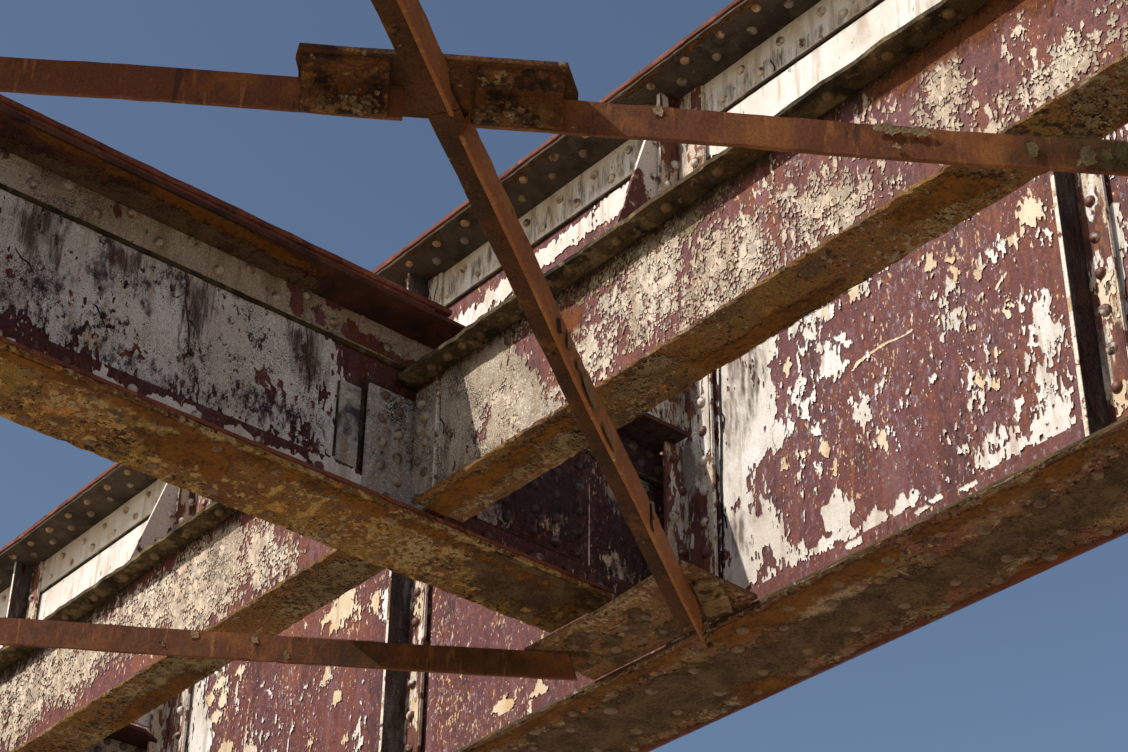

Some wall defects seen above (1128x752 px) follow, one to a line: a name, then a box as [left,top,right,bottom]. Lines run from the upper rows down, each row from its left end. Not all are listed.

rust [314,87,382,116]
damp [13,204,63,271]
damp [106,241,147,274]
peeling [535,181,630,269]
peeling [567,0,1128,452]
damp [170,272,214,356]
peeling [0,189,416,485]
damp [287,320,323,386]
rust [686,280,852,371]
peeling [676,195,1076,589]
rust [0,349,551,591]
rust [471,428,1128,752]